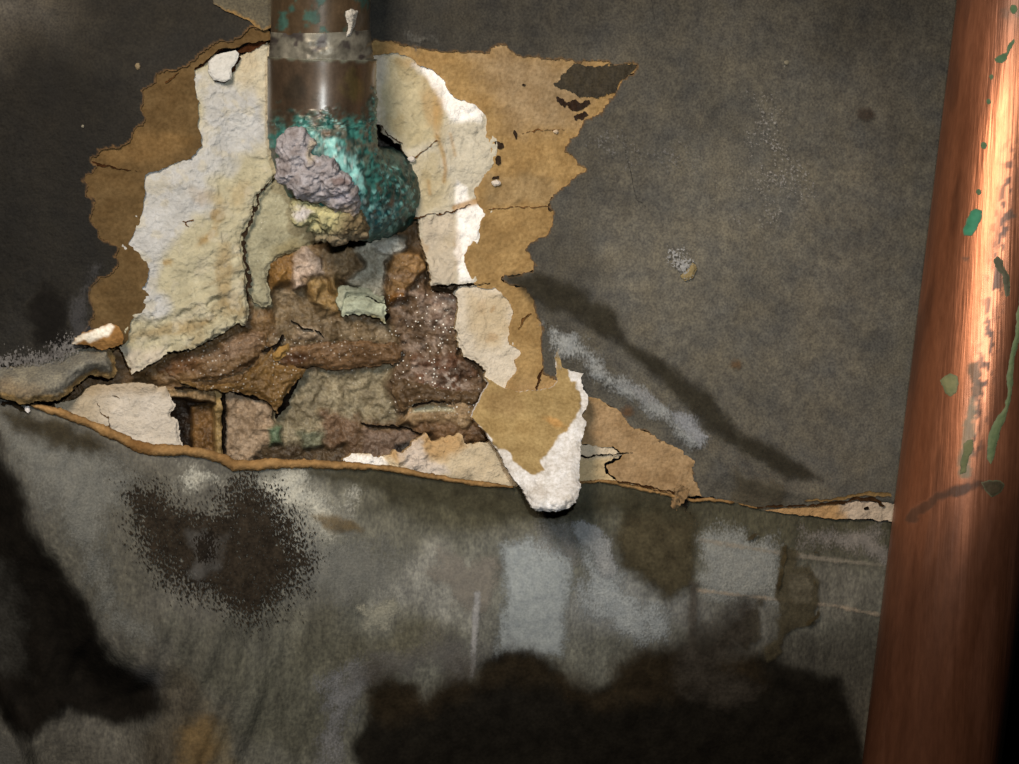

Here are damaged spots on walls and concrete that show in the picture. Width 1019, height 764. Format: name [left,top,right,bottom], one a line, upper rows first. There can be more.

damp [0,412,531,764]
spalling [22,41,622,512]
damp [316,490,863,764]
damp [511,273,812,479]
crack [757,491,891,509]
damp [808,529,888,566]